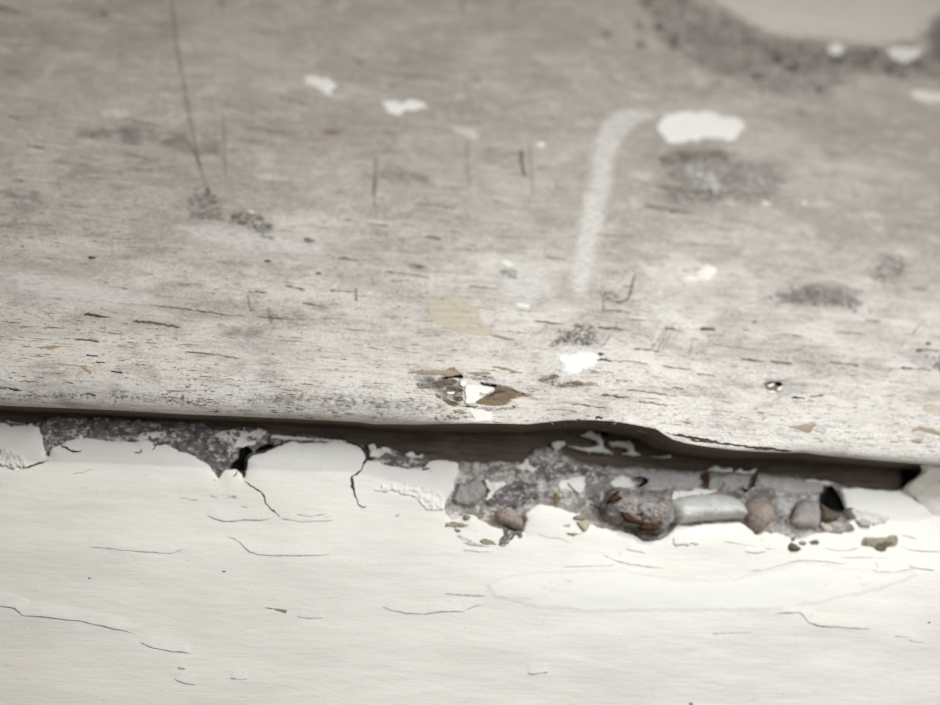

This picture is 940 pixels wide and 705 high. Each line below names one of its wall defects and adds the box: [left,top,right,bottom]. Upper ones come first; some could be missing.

peeling [447,380,495,405]
crack [23,445,81,468]
peeling [0,415,429,478]
crack [233,471,280,517]
crack [329,438,391,507]
peeling [374,431,919,572]